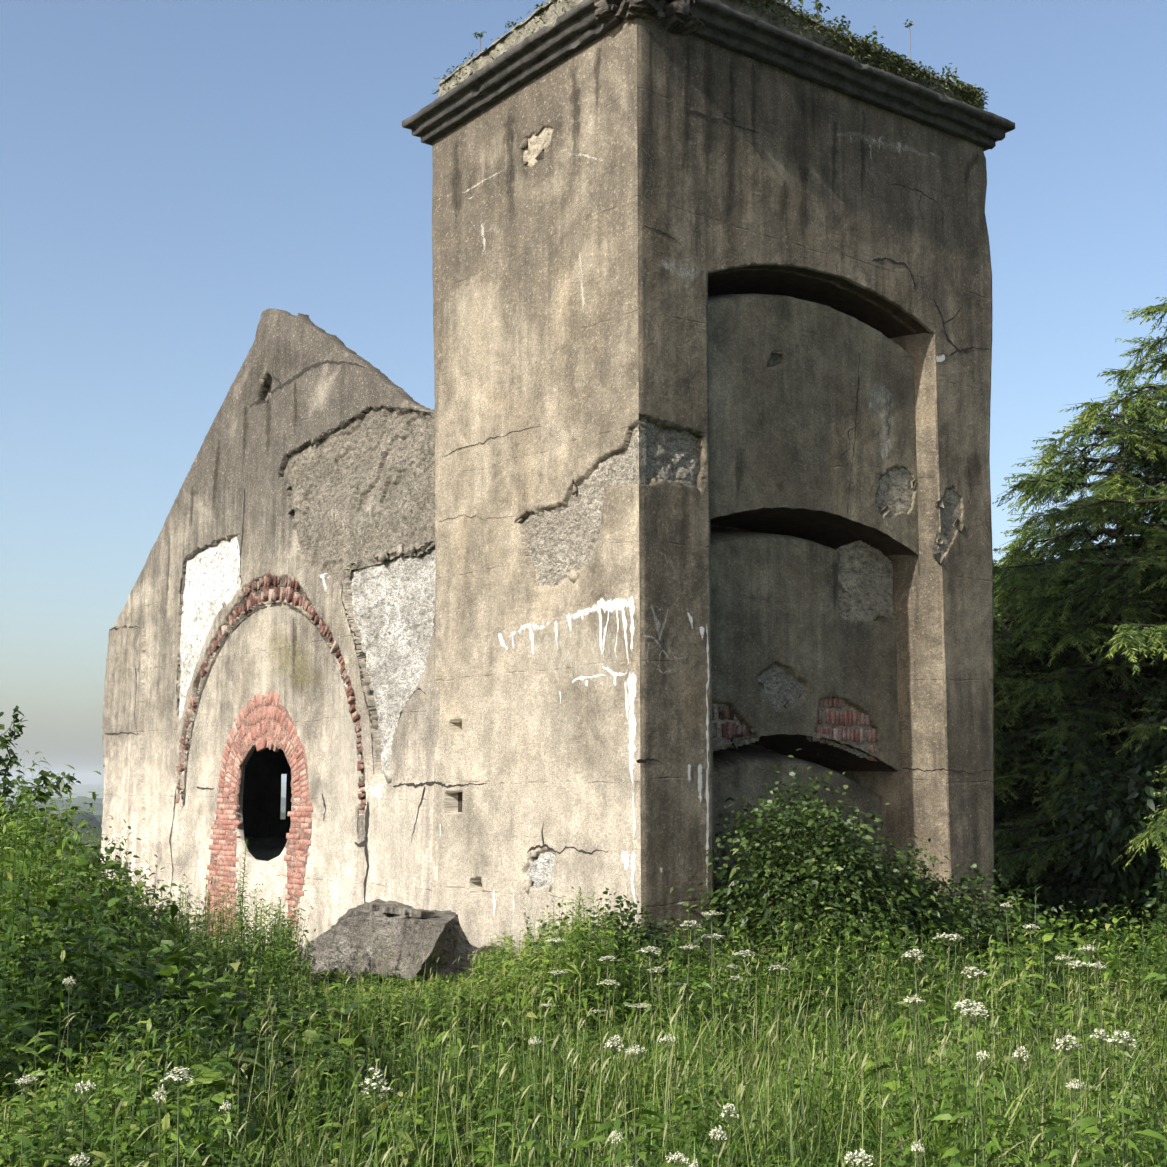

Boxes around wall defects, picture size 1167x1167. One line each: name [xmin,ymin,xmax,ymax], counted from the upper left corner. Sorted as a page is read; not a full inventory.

peeling [517,125,554,167]
crack [872,257,991,357]
spalling [514,416,700,586]
peeling [932,488,964,564]
peeling [179,536,242,719]
spalling [283,408,436,783]
peeling [836,540,894,624]
leakage [498,597,684,918]
efflorescence [687,612,709,898]
spalling [806,697,881,761]
spalling [523,851,555,894]
crack [526,823,608,855]